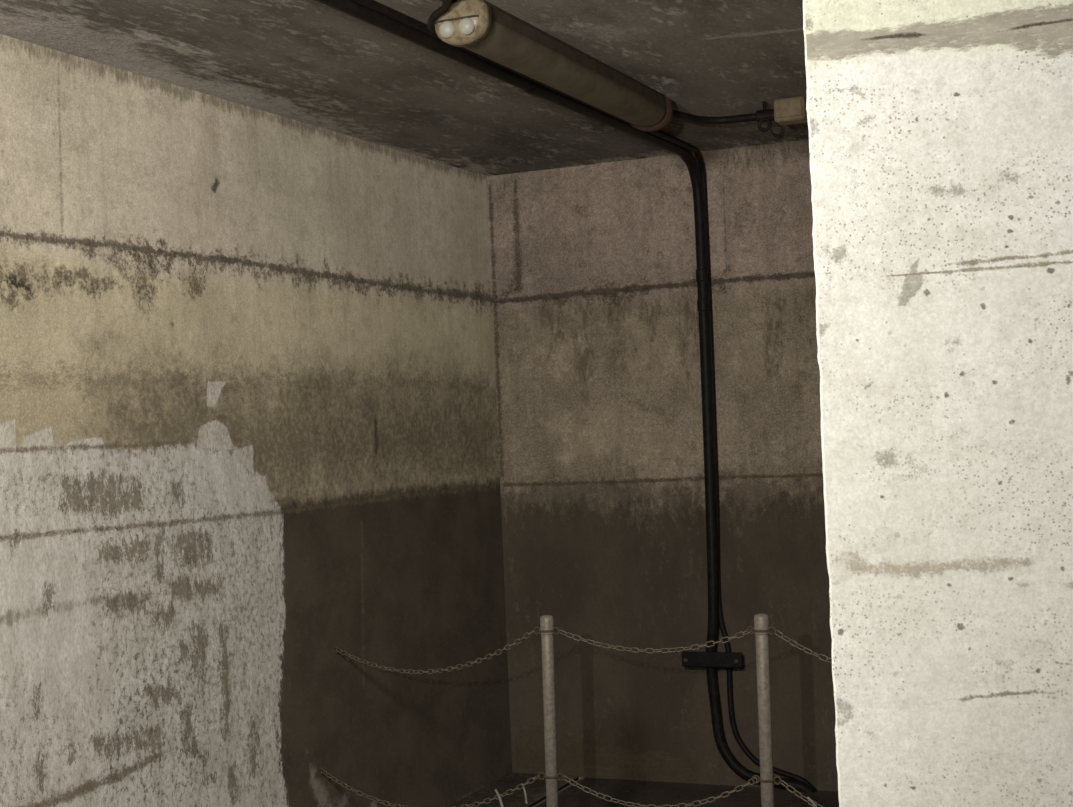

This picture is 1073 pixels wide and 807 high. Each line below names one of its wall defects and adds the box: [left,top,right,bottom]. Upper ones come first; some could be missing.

damp [0,0,666,175]
damp [485,0,1073,152]
peeling [207,381,225,407]
damp [0,230,516,310]
damp [520,279,693,391]
peeling [0,418,289,807]
damp [0,374,1031,807]